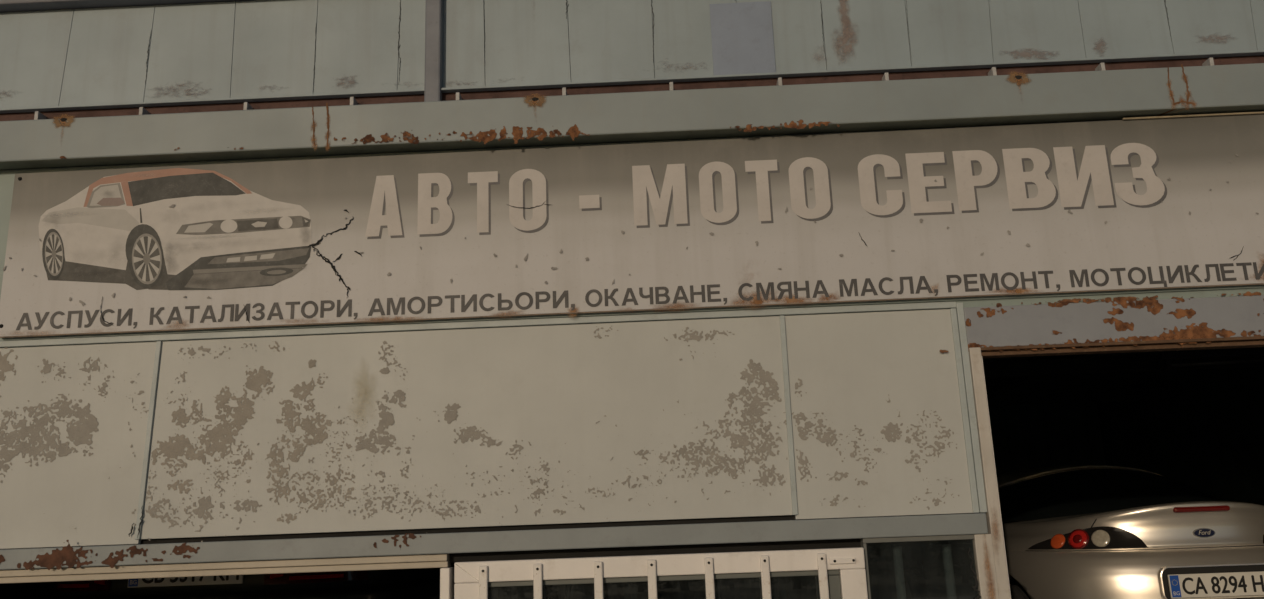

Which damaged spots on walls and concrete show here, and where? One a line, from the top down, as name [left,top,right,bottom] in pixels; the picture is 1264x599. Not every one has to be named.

rust [1157,64,1195,116]
rust [312,103,590,150]
crack [308,209,361,296]
peeling [664,327,734,361]
rust [965,288,1264,352]
peeling [0,347,149,483]
peeling [132,341,959,542]
rust [0,540,200,570]
rust [373,533,421,548]